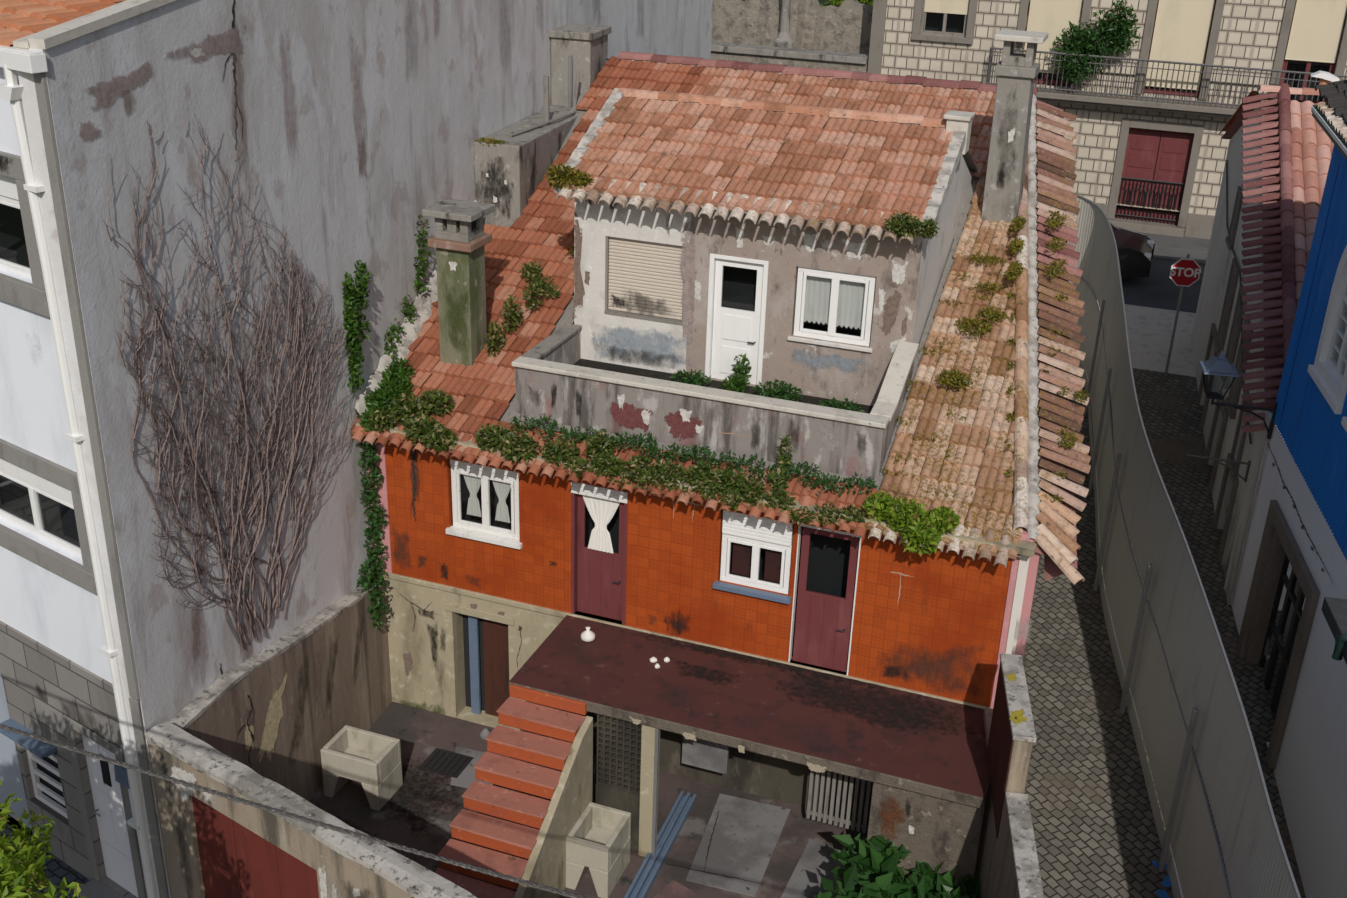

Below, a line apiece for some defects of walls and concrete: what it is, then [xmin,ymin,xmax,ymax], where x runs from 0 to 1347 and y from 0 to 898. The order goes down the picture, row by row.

peeling [80,62,152,141]
peeling [169,25,245,62]
crack [222,0,246,150]
peeling [879,256,908,353]
peeling [611,394,704,441]
leakage [645,616,974,734]